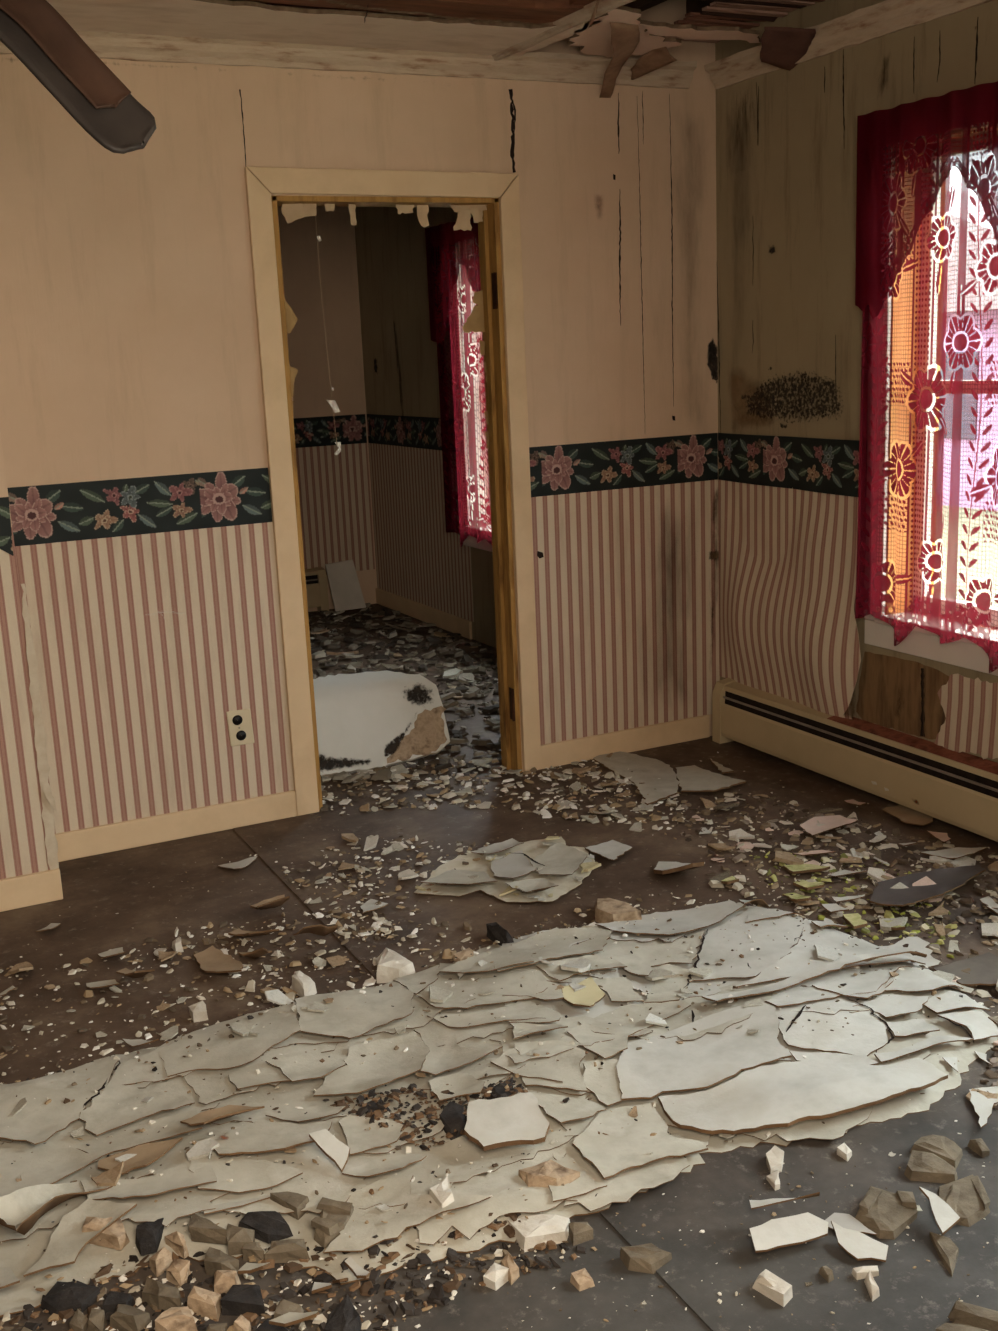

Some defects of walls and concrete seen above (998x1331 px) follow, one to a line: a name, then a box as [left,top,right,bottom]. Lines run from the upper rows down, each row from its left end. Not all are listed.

crack [508,89,516,173]
damp [707,340,841,428]
peeling [856,651,949,740]